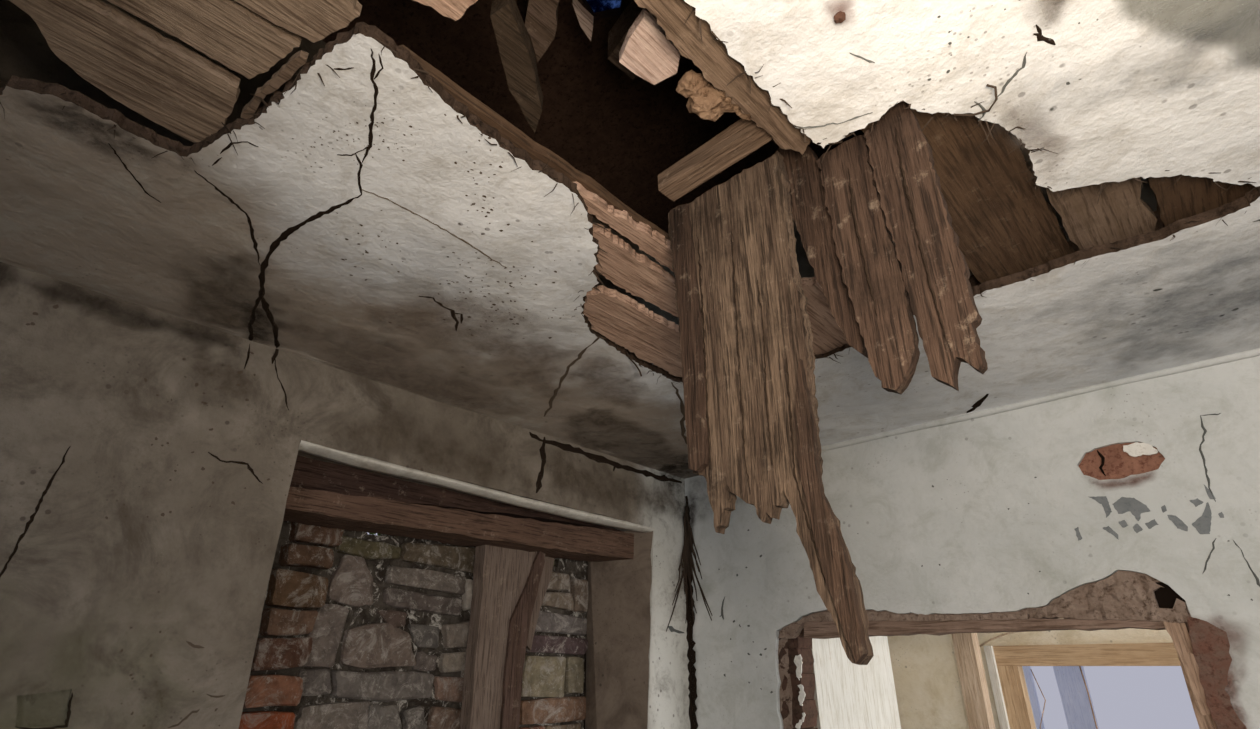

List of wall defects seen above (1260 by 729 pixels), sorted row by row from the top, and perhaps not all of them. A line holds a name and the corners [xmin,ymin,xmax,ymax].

leakage [1126,0,1260,64]
crack [194,49,505,410]
leakage [292,90,416,168]
leakage [454,129,510,235]
leakage [413,252,557,378]
crack [0,446,71,577]
crack [529,337,725,729]
flaking render [1079,442,1224,540]
crack [1199,413,1221,502]
crack [1203,538,1260,587]
flaking render [778,612,833,729]
flaking render [866,572,1247,729]